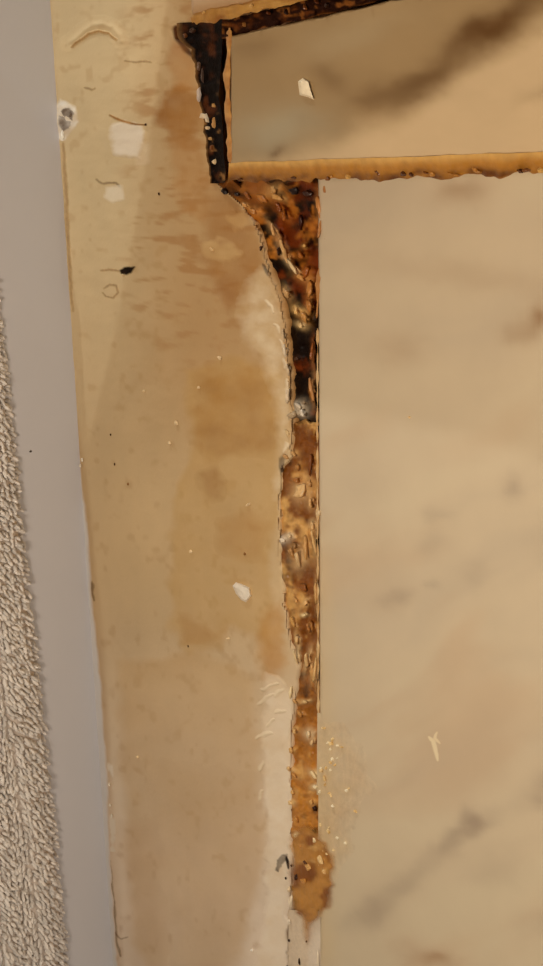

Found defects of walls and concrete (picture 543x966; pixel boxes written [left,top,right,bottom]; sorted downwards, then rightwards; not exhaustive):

water stain [111,352,294,966]
corrosion [287,827,332,929]